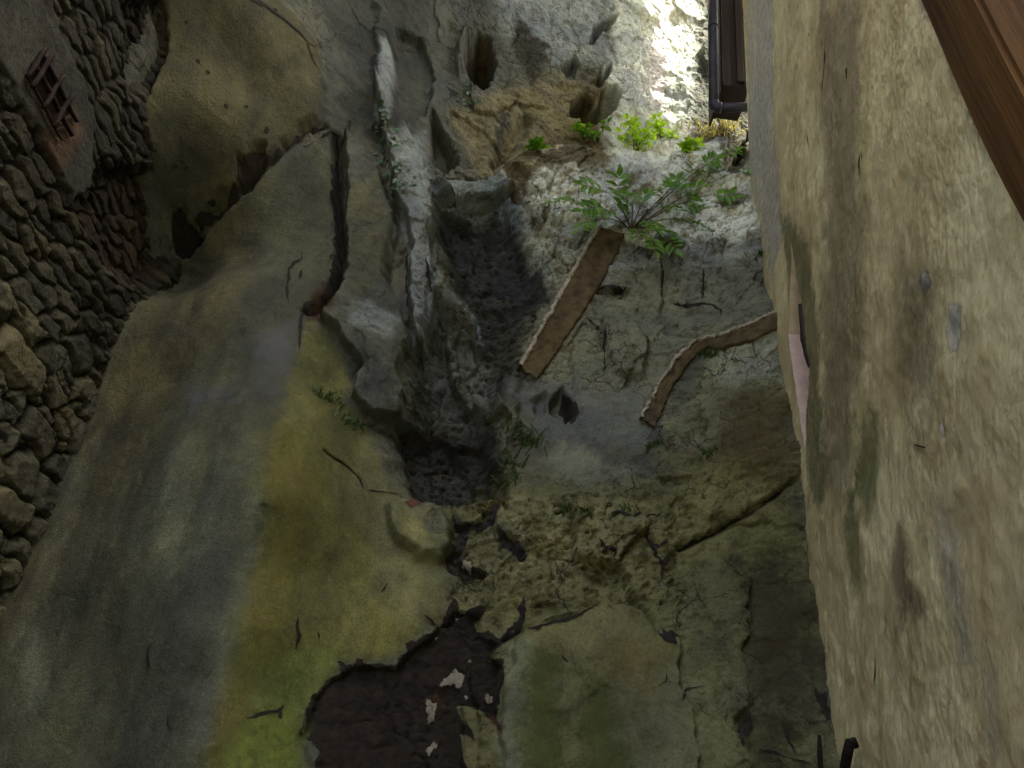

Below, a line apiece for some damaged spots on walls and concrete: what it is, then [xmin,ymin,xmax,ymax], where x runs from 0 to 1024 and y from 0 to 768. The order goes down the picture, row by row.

spalling [171,207,214,259]
crack [200,120,351,350]
crack [325,451,399,494]
spalling [446,504,528,582]
crack [611,480,797,575]
peeling [299,598,505,768]